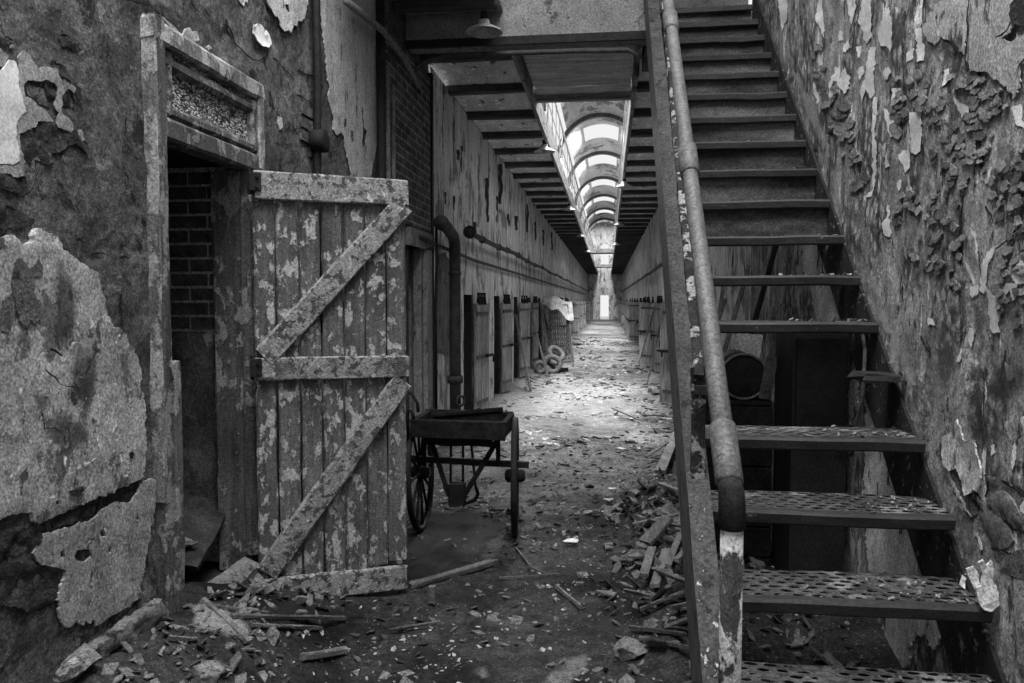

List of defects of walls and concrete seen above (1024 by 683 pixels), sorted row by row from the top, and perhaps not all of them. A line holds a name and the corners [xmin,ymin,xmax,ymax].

peeling [252,24,272,47]
peeling [778,0,788,30]
spalling [24,61,90,109]
spalling [0,122,91,231]
peeling [810,0,1024,334]
spalling [0,258,43,332]
peeling [800,245,841,321]
peeling [956,328,974,362]
peeling [64,383,124,474]
peeling [847,363,875,435]
spalling [952,470,1024,531]
spalling [0,474,138,613]